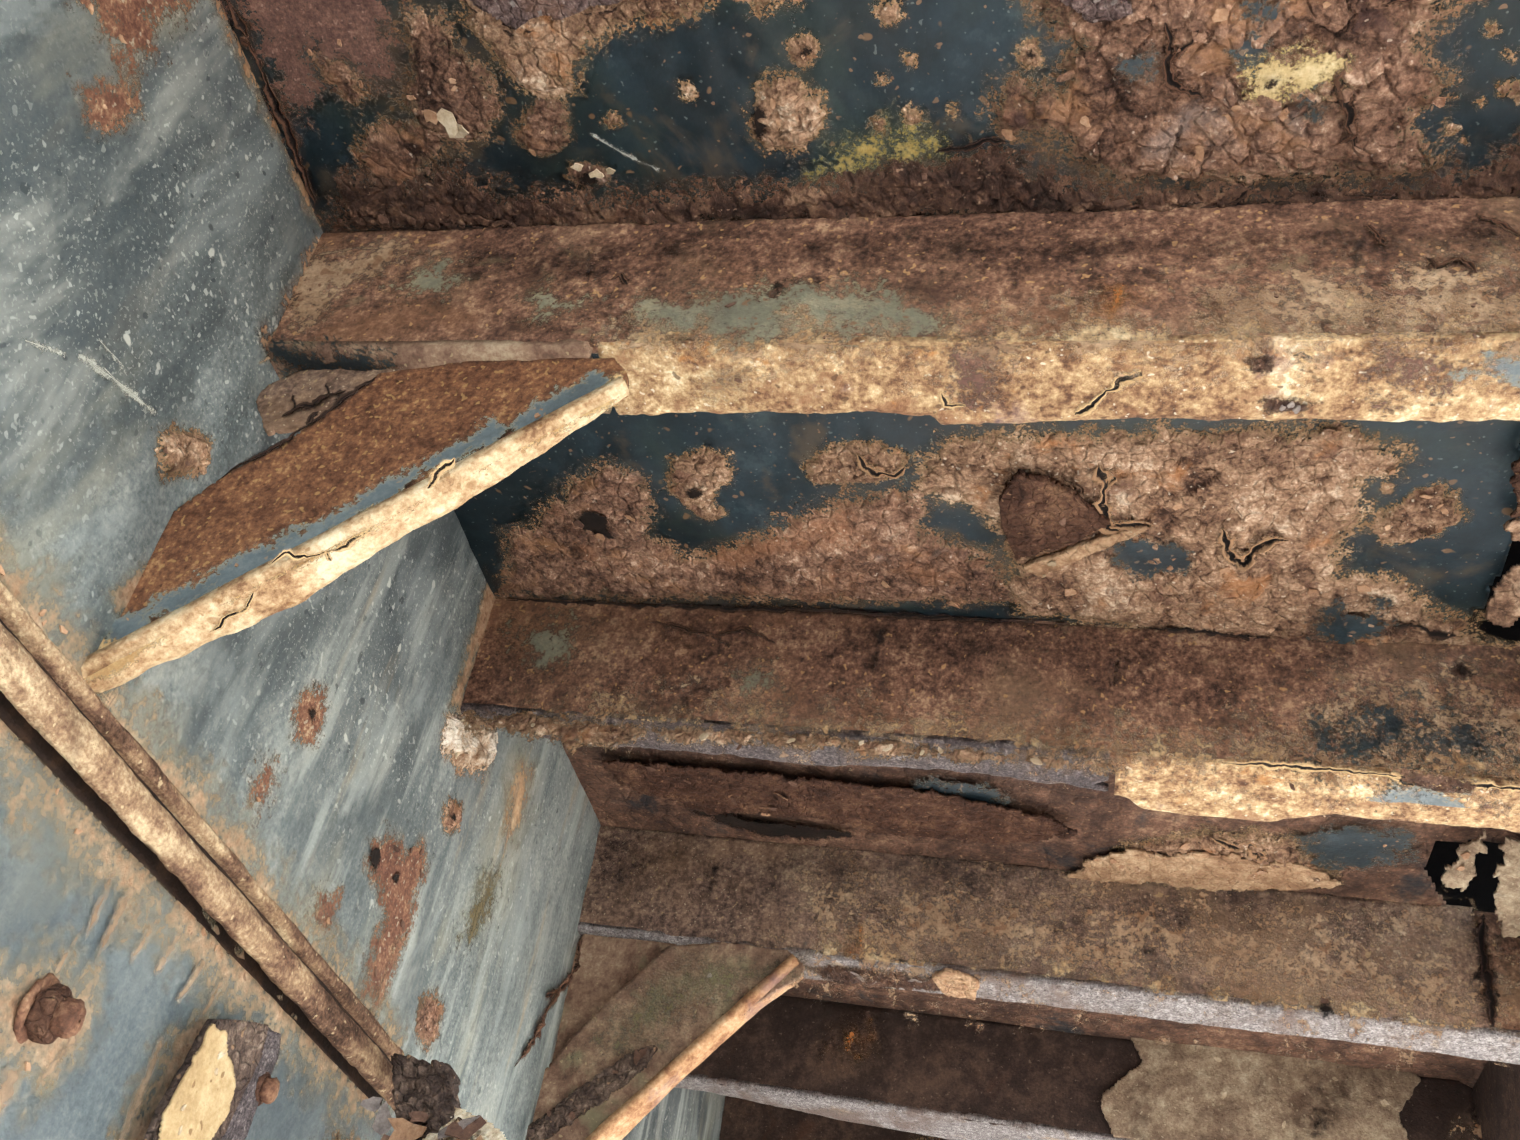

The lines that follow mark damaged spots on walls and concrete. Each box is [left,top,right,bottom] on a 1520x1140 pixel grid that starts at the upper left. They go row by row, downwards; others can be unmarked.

crack [1382,0,1421,8]
crack [1157,23,1204,99]
spalling [974,0,1488,196]
spalling [566,158,616,190]
corrosion [65,0,1520,363]
corrosion [151,419,216,485]
crack [221,377,377,479]
corrosion [223,503,416,605]
corrosion [440,222,1520,1067]
corrosion [0,526,446,1057]
corrosion [0,719,385,1140]